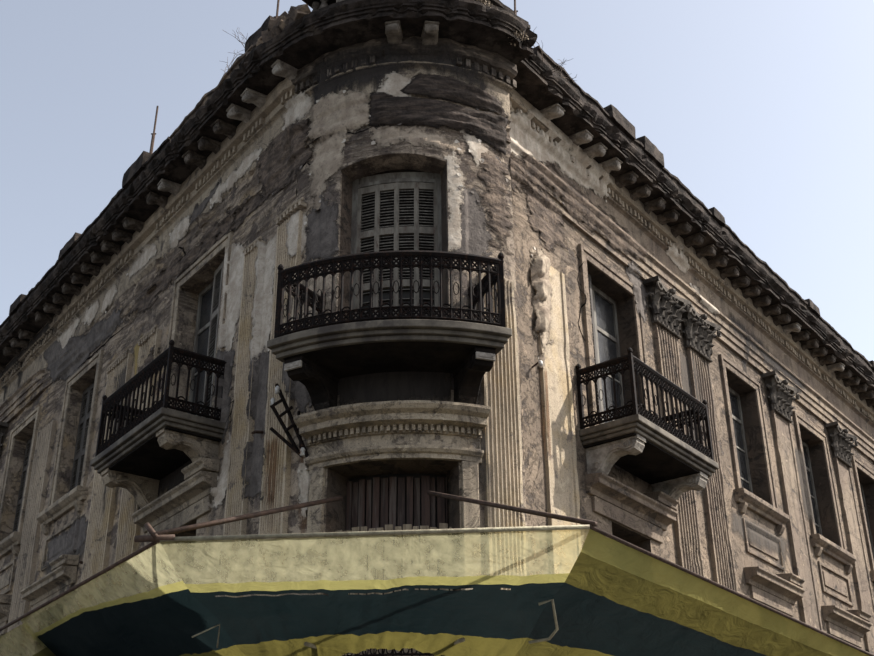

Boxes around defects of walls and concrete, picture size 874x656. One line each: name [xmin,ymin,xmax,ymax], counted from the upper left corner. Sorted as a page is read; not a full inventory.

flaking render [55,283,117,348]
spalling [126,71,654,509]
crack [573,249,588,342]
rust [266,439,277,502]
flaking render [297,456,312,523]